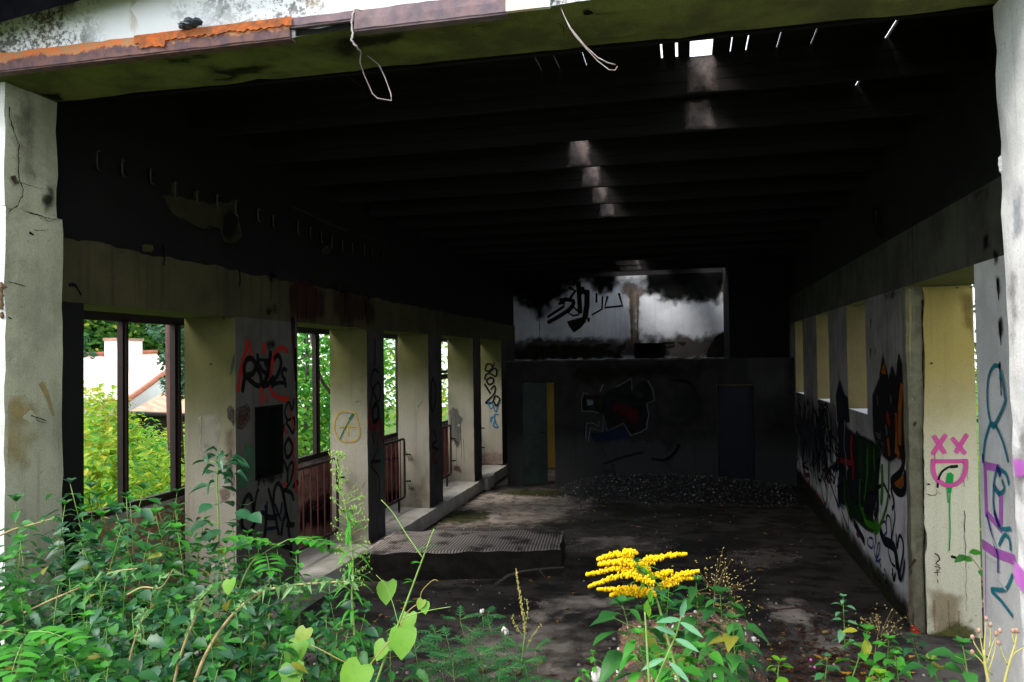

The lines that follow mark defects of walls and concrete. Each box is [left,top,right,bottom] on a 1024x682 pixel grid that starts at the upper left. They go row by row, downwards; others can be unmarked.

corrosion [134,16,292,49]
crack [9,107,60,231]
water stain [40,382,54,416]
water stain [8,400,33,456]